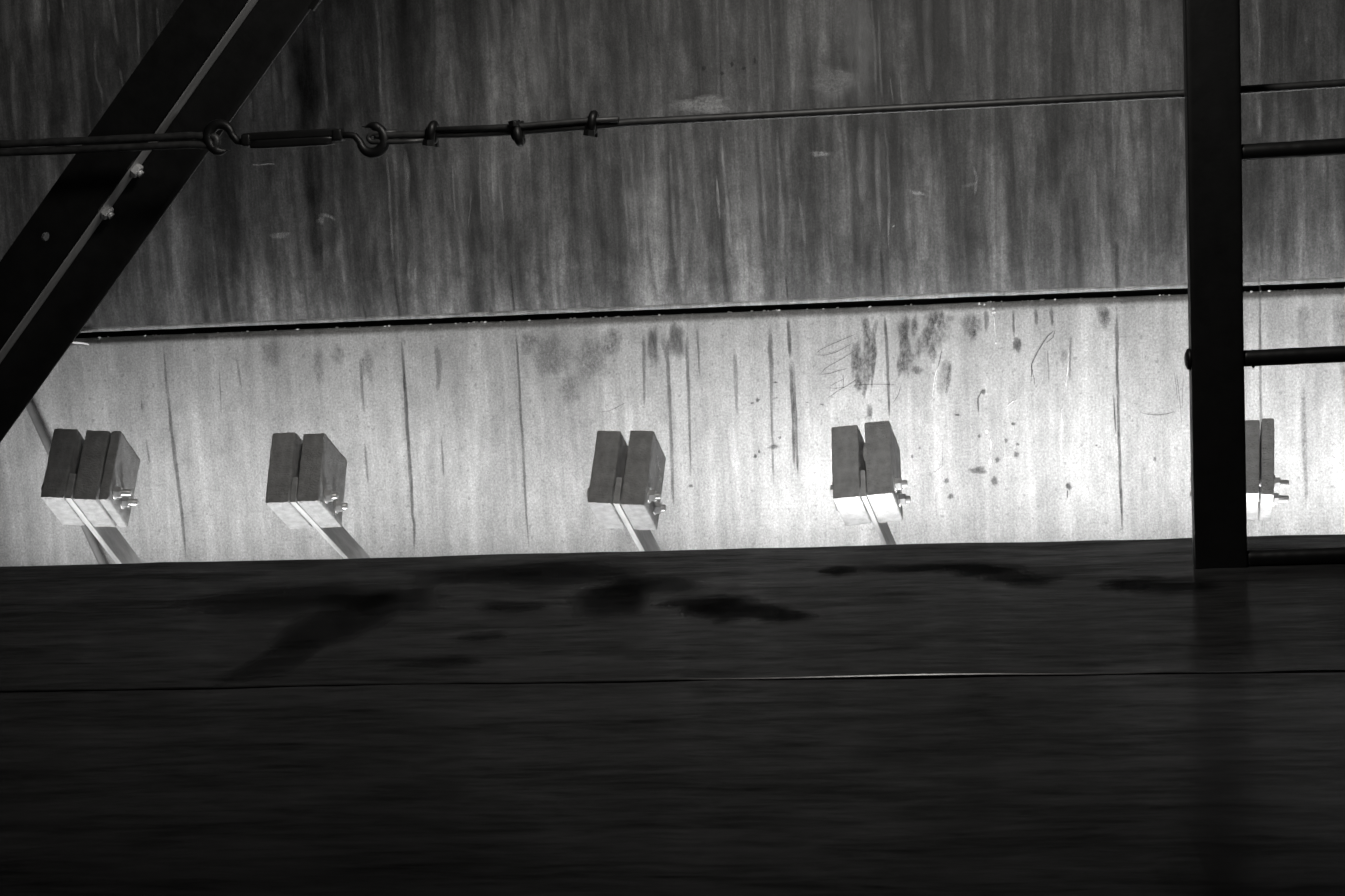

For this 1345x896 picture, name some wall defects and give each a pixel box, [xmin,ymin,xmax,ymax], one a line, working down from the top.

damp [852,314,944,393]